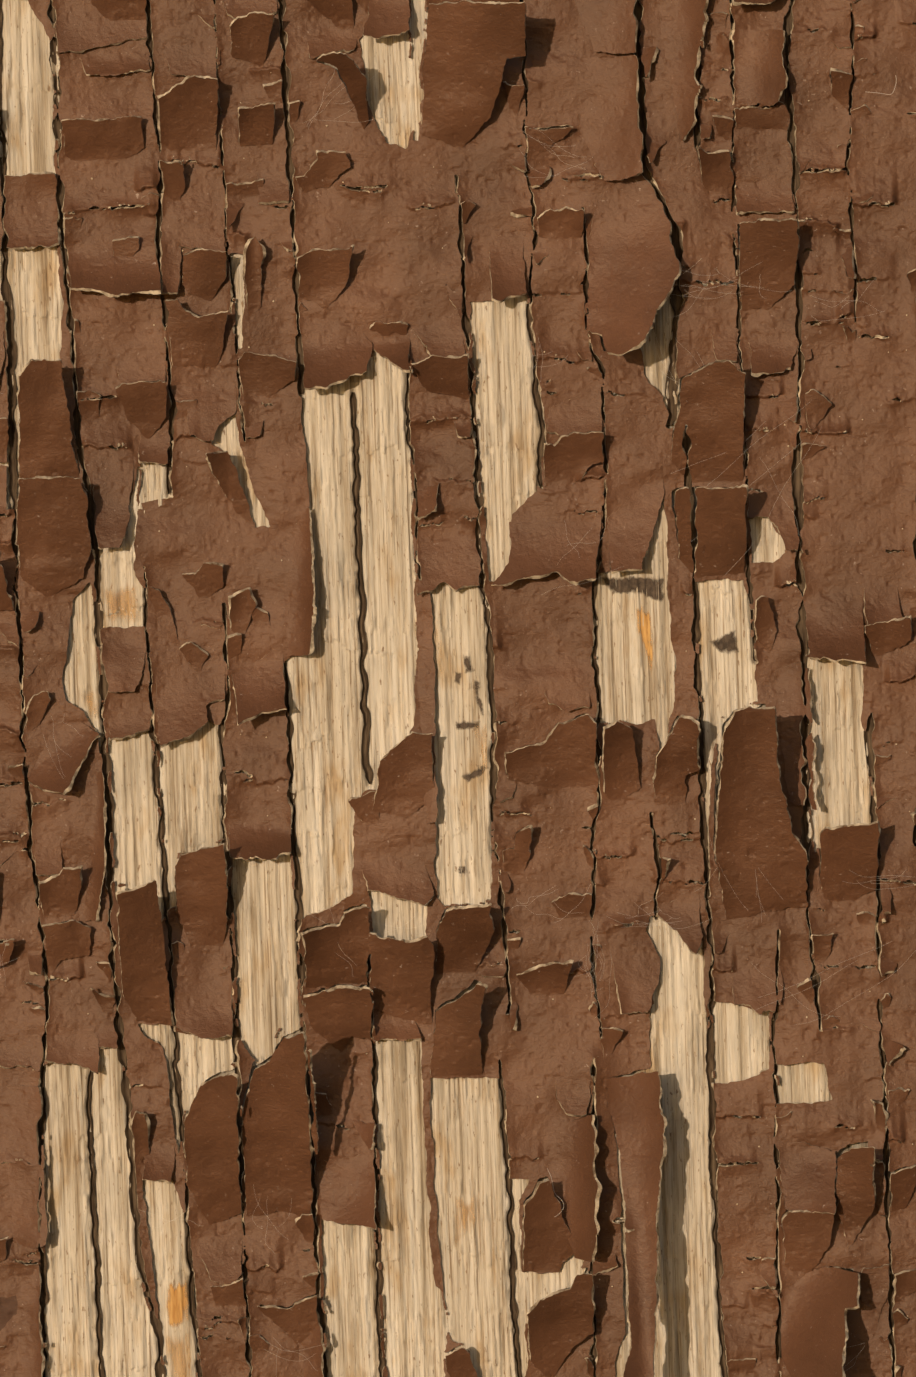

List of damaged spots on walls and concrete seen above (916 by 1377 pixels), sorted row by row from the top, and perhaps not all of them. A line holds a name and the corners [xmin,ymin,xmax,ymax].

crack [0,0,49,1377]
peeling [0,210,92,597]
peeling [0,0,151,202]
crack [48,0,202,1377]
peeling [0,284,618,1377]
peeling [307,0,527,150]
crack [522,40,569,487]
peeling [452,0,912,920]
peeling [606,882,783,1377]
crack [634,0,888,1377]
crack [864,713,916,1377]
crack [886,534,916,559]